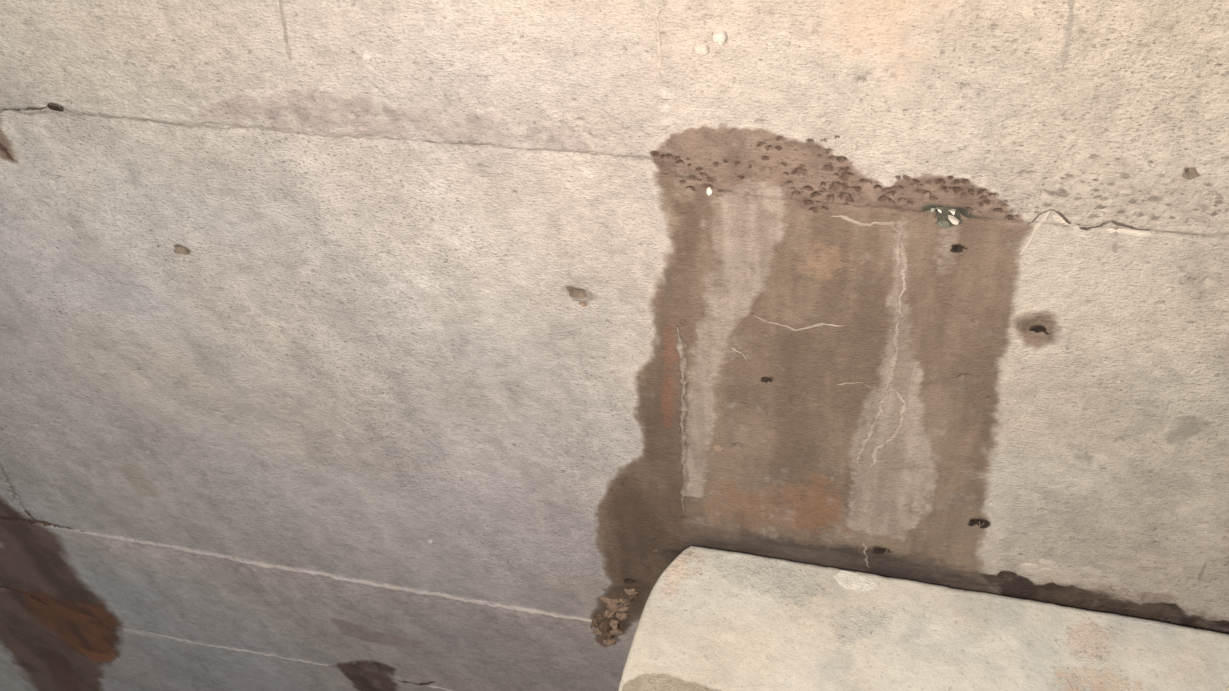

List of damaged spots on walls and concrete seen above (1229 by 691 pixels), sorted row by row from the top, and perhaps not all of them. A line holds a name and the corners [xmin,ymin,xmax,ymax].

crack [1020,209,1229,256]
leakage [589,122,1229,634]
rust [3,584,132,666]
leakage [622,673,722,691]